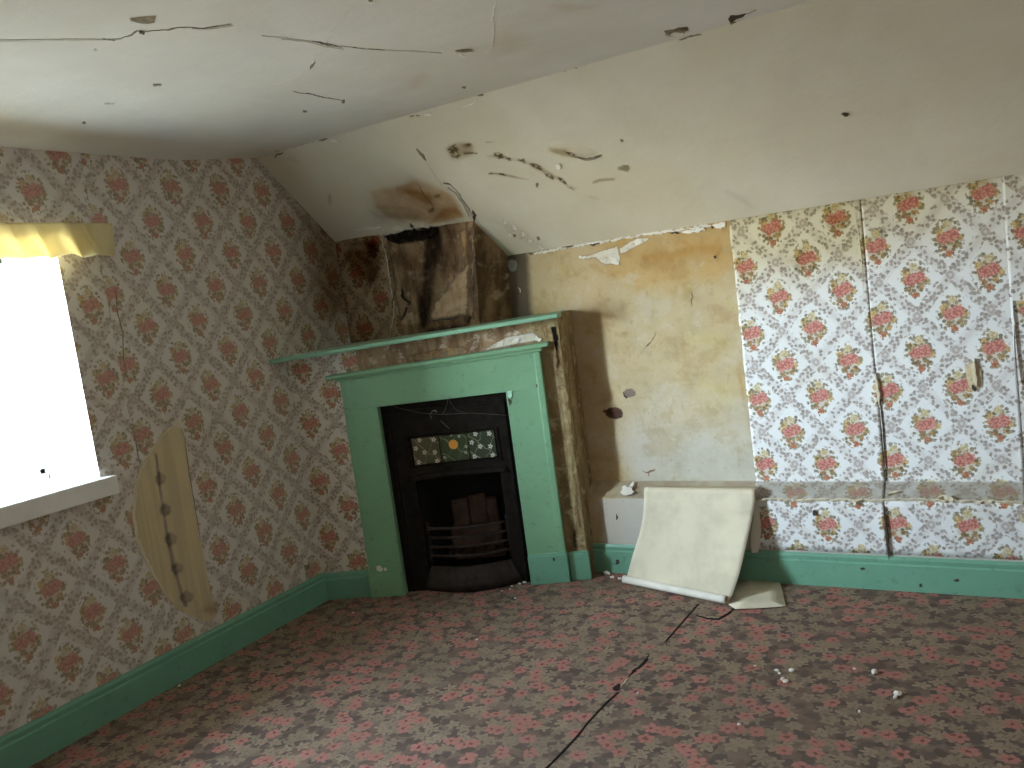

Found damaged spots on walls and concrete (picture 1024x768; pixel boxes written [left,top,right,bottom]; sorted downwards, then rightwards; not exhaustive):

crack [0,24,233,43]
flaking render [664,27,689,37]
crack [262,11,438,104]
flaking render [504,220,725,265]
peeling [132,426,216,622]